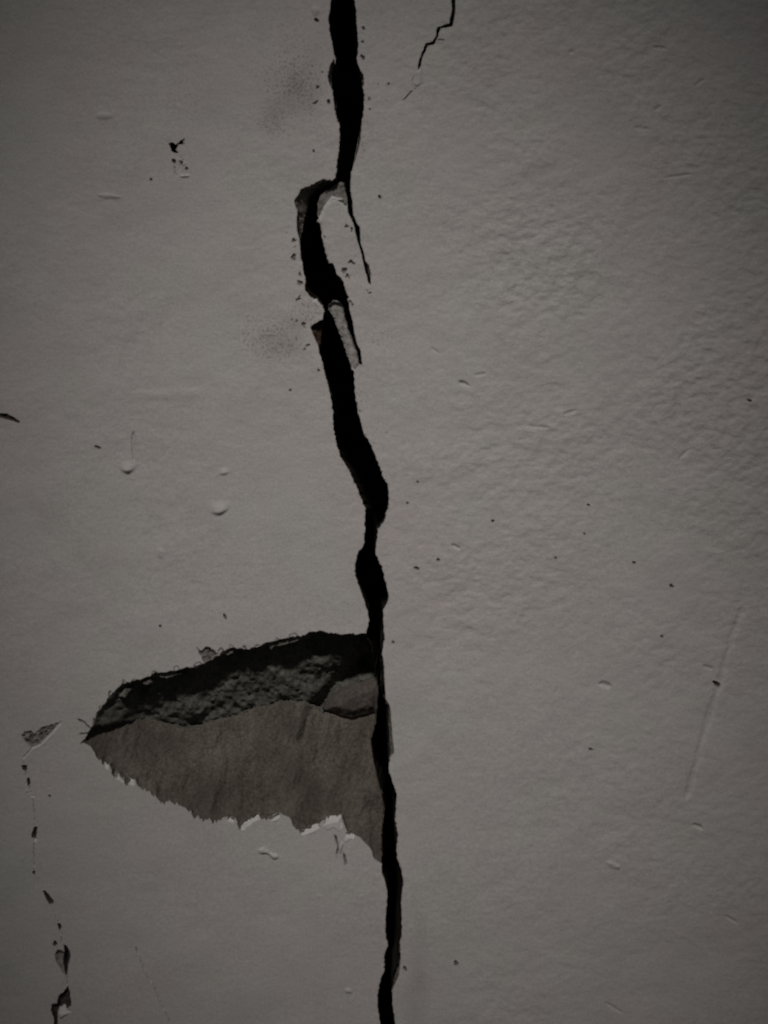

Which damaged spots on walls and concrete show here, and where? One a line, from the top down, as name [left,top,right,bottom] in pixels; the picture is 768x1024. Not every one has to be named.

crack [286,0,456,1024]
peeling [21,720,63,759]
flaking render [78,630,386,866]